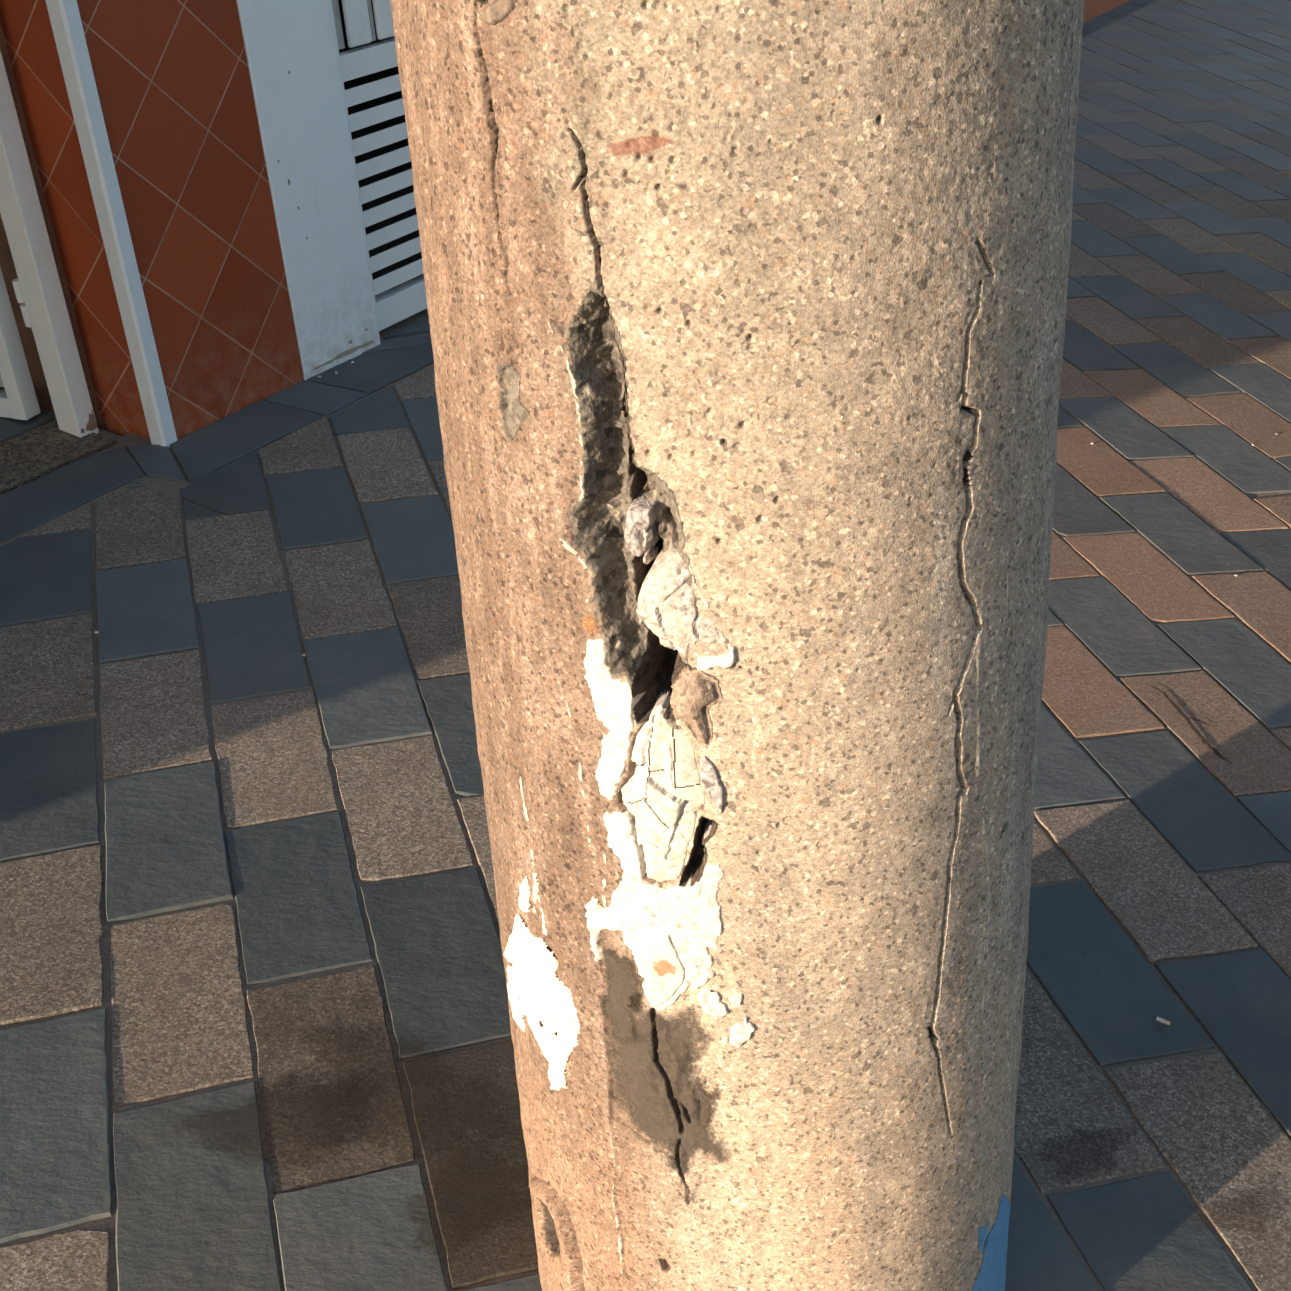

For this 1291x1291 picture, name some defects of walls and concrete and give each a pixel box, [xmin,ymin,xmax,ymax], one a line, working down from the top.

spalling [467,0,515,25]
crack [577,151,603,282]
crack [957,451,977,624]
peeling [584,639,755,1048]
peeling [504,872,580,1091]
crack [928,1027,948,1121]